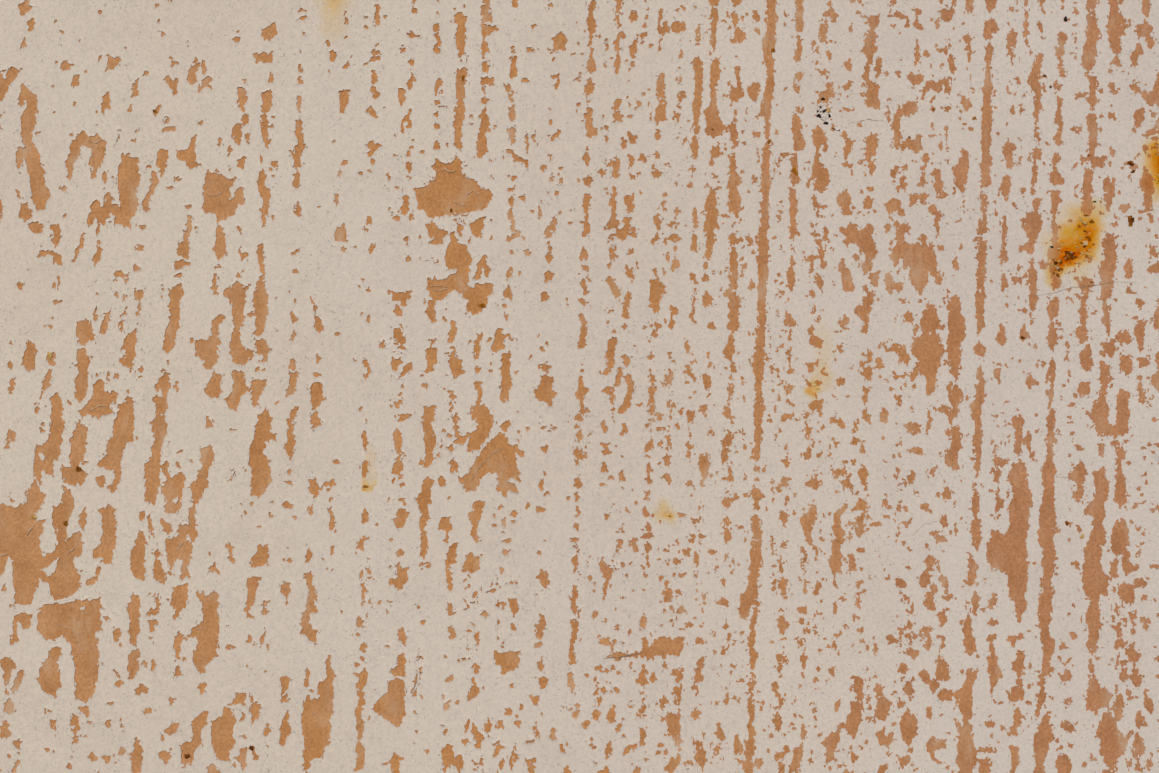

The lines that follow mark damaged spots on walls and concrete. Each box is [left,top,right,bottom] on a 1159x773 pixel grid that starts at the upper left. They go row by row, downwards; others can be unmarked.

peeling [0,0,344,773]
peeling [314,0,1159,773]
rust [1050,201,1096,278]